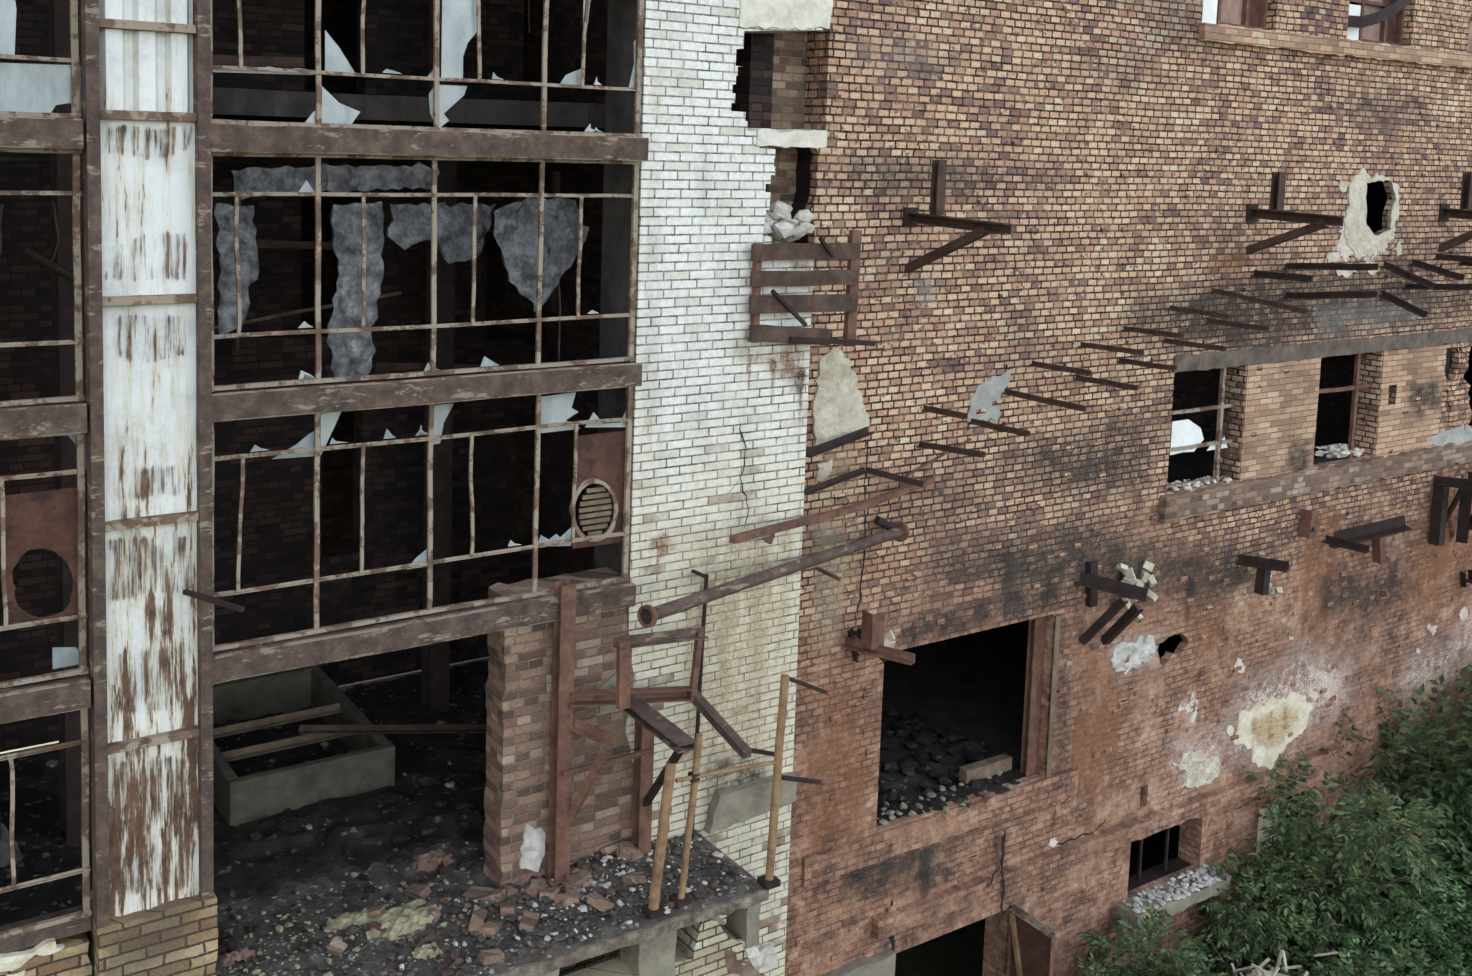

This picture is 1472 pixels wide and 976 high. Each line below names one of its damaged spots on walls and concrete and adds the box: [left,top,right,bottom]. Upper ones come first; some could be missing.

corrosion [108,124,192,168]
corrosion [105,231,186,281]
peeling [1326,252,1379,278]
corrosion [118,314,184,363]
spalling [1426,342,1472,449]
corrosion [135,466,181,501]
corrosion [120,642,182,715]
spalling [1110,634,1158,675]
spalling [1172,750,1220,788]
corrosion [108,756,191,895]